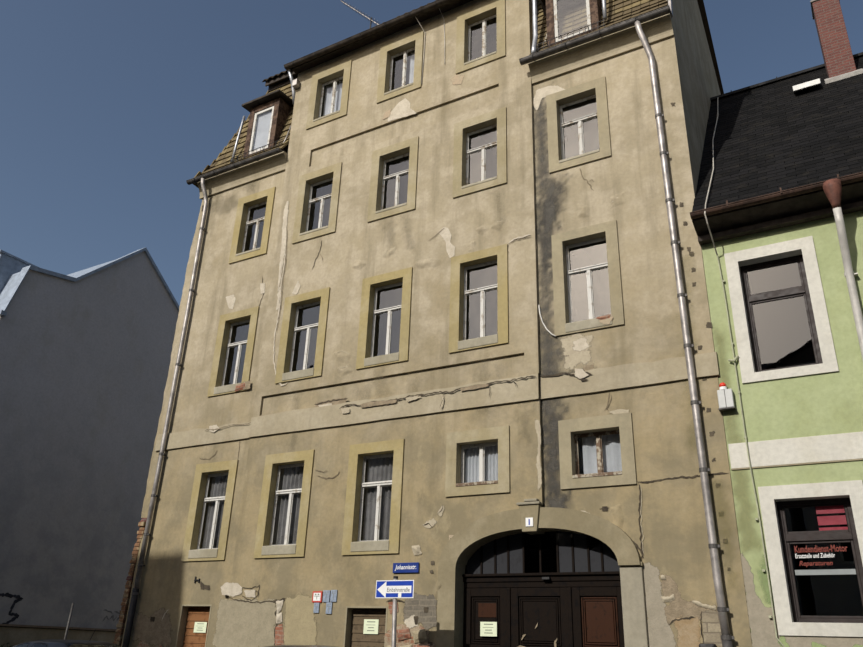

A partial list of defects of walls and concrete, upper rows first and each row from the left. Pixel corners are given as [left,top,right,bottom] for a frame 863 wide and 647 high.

peeling [382,98,416,122]
peeling [533,86,565,110]
peeling [276,201,289,310]
damp [534,98,571,376]
peeling [560,333,595,371]
crack [339,368,592,414]
damp [541,397,567,508]
crack [610,472,728,559]
peeling [221,582,242,597]
flaking render [384,592,437,647]
peeling [661,574,722,647]
peeling [741,554,863,647]